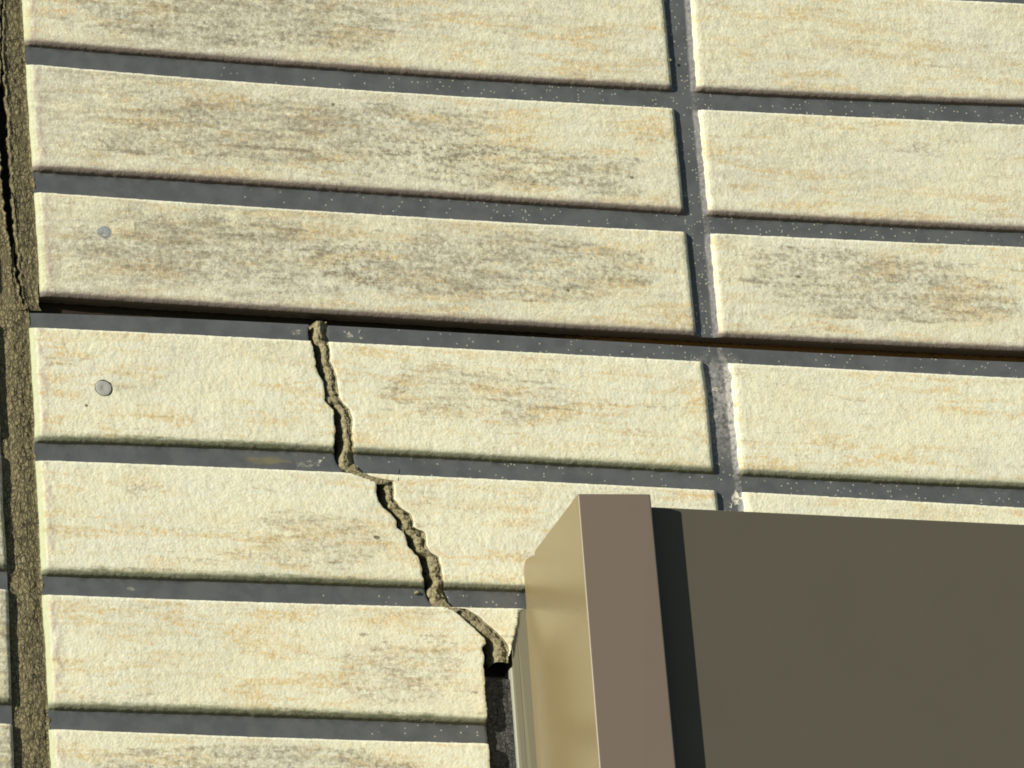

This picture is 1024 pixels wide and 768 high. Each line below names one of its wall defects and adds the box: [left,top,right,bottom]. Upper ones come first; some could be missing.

crack [0,0,29,311]
crack [308,321,509,677]